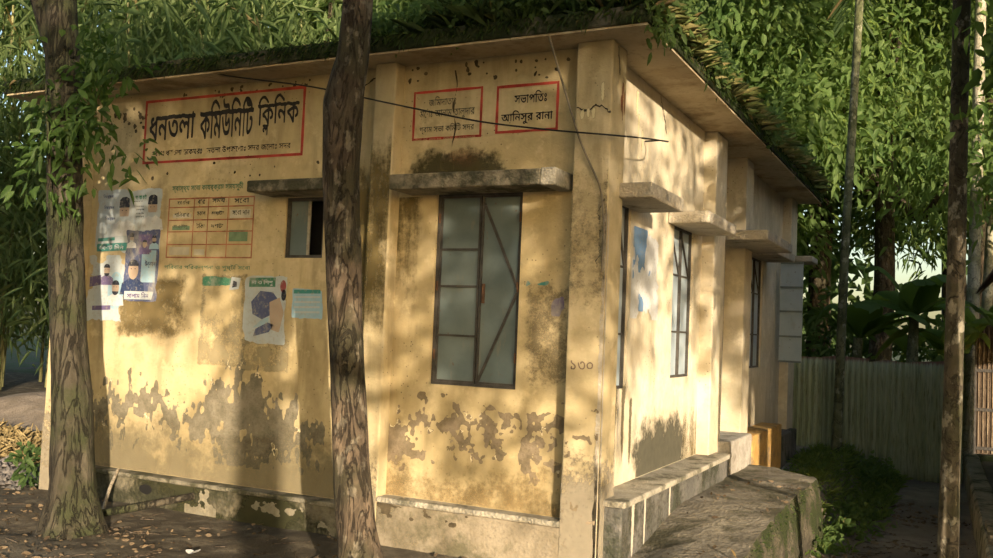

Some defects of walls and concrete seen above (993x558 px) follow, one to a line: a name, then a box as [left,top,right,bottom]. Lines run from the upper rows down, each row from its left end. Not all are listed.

damp [411,60,505,174]
crack [577,104,611,113]
damp [118,279,184,337]
flaking render [387,207,609,558]
flaking render [92,360,325,466]
spalling [184,489,216,517]
spalling [251,501,304,517]